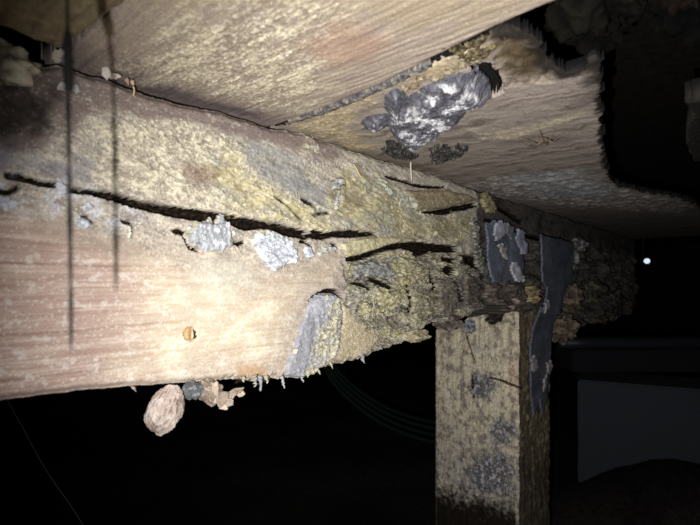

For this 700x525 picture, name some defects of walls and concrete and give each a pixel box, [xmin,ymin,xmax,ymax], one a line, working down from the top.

crack [0,173,55,195]
crack [385,176,444,189]
crack [416,192,540,241]
crack [72,189,485,301]